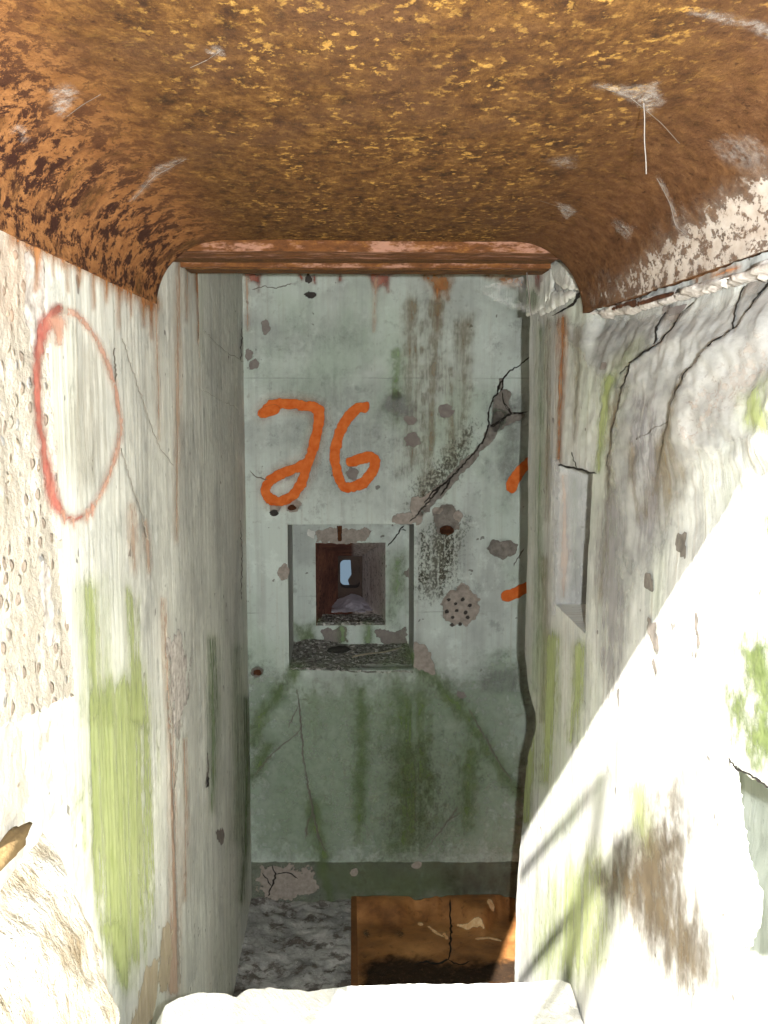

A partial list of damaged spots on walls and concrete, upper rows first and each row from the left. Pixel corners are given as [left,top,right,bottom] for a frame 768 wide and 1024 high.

corrosion [12,236,81,276]
corrosion [176,262,199,429]
corrosion [423,274,449,299]
crack [388,357,529,546]
spalling [392,378,525,535]
crack [552,292,598,316]
crack [558,302,694,490]
crack [636,283,768,440]
damp [85,584,109,718]
damp [126,589,148,725]
spalling [440,583,480,627]
damp [251,800,519,903]